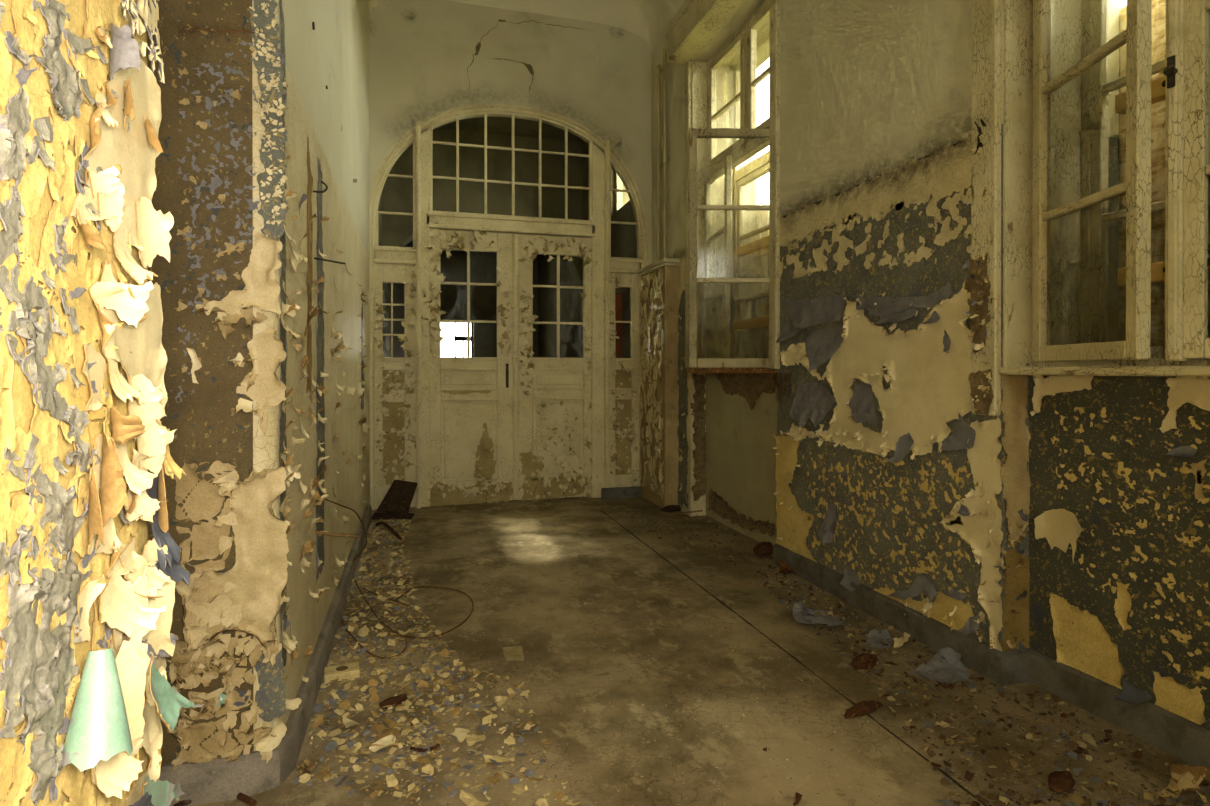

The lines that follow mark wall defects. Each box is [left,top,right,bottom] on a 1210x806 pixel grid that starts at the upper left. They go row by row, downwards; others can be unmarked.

crack [467,19,593,98]
peeling [0,0,495,806]
peeling [413,132,1210,725]